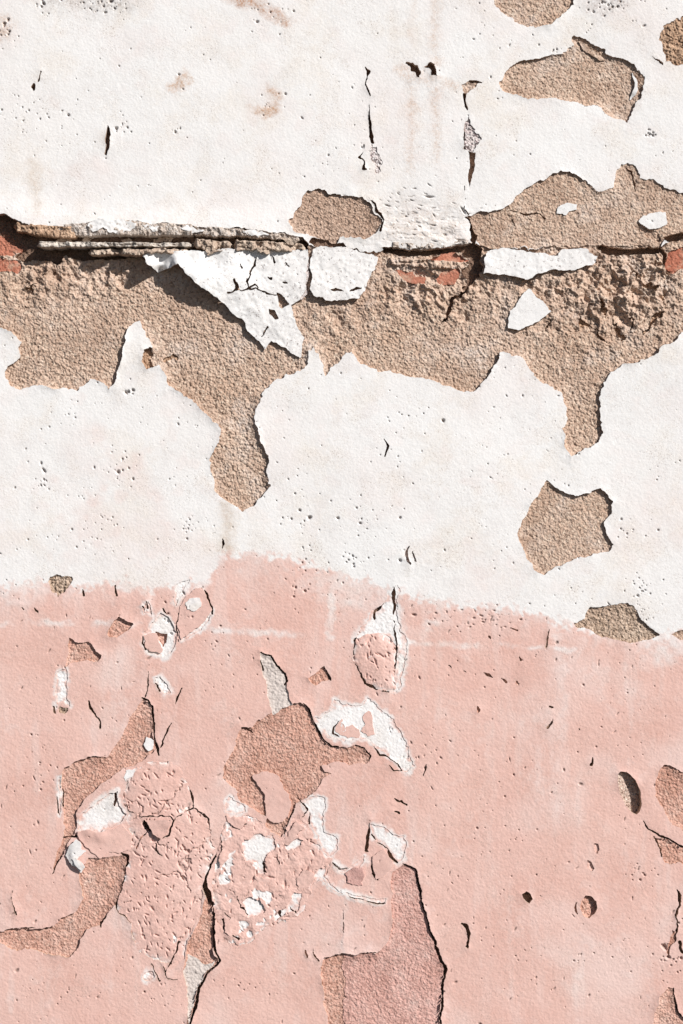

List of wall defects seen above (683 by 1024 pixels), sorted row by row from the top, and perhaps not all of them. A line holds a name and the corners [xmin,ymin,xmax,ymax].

crack [359,69,383,174]
crack [462,81,482,214]
spalling [494,0,573,28]
spalling [499,36,645,122]
spalling [659,16,683,66]
crack [371,201,384,232]
spalling [0,163,683,512]
spalling [517,480,613,575]
spalling [574,603,659,643]
spalling [0,676,182,957]
peeling [212,652,447,1024]
spalling [655,765,683,830]